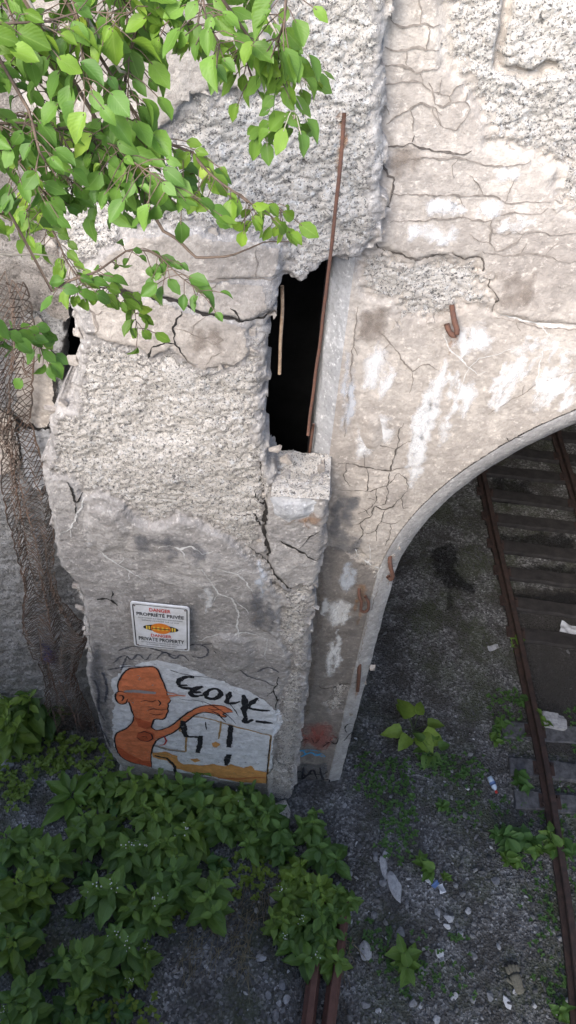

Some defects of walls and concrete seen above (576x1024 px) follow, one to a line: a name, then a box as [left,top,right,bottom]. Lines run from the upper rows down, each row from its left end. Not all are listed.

crack [89,249,280,369]
spalling [0,0,495,799]
crack [230,462,325,589]
crack [339,0,576,576]